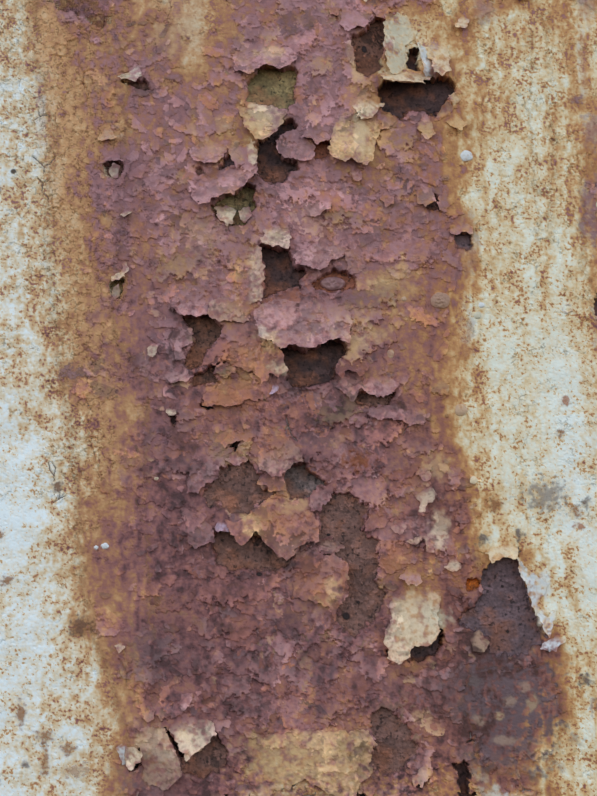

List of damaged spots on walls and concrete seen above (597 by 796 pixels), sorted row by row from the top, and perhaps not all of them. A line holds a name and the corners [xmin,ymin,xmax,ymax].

peeling [454,16,470,28]
rust [189,0,468,226]
rust [31,0,228,790]
peeling [147,343,158,357]
rust [165,223,366,410]
peeling [335,356,369,402]
peeling [414,463,437,513]
rust [186,429,443,665]
peeling [390,521,435,553]
peeling [444,558,461,572]
rust [452,529,568,796]
rust [209,708,431,796]